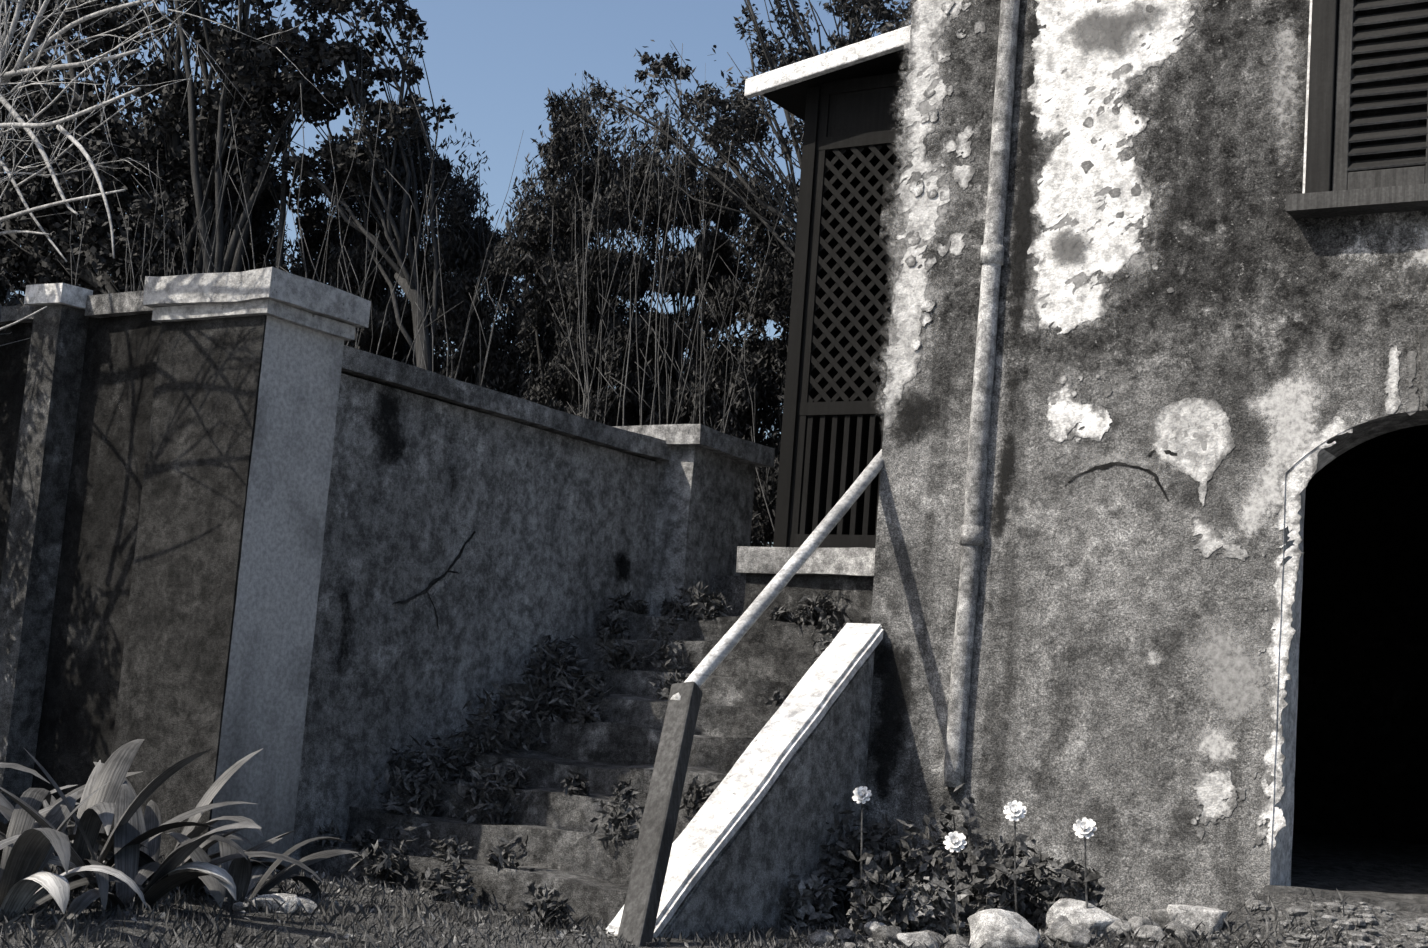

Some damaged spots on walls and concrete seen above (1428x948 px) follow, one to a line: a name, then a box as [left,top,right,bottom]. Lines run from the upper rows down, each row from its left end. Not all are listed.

water stain [1026,1,1038,43]
water stain [1273,21,1298,154]
water stain [1011,66,1037,345]
peeling [1024,0,1197,335]
water stain [992,363,1018,537]
peeling [1046,375,1113,443]
crack [1068,450,1177,501]
water stain [1239,373,1320,537]
crack [392,531,476,630]
water stain [869,643,913,799]
water stain [1191,624,1273,761]
peeling [1149,398,1353,850]